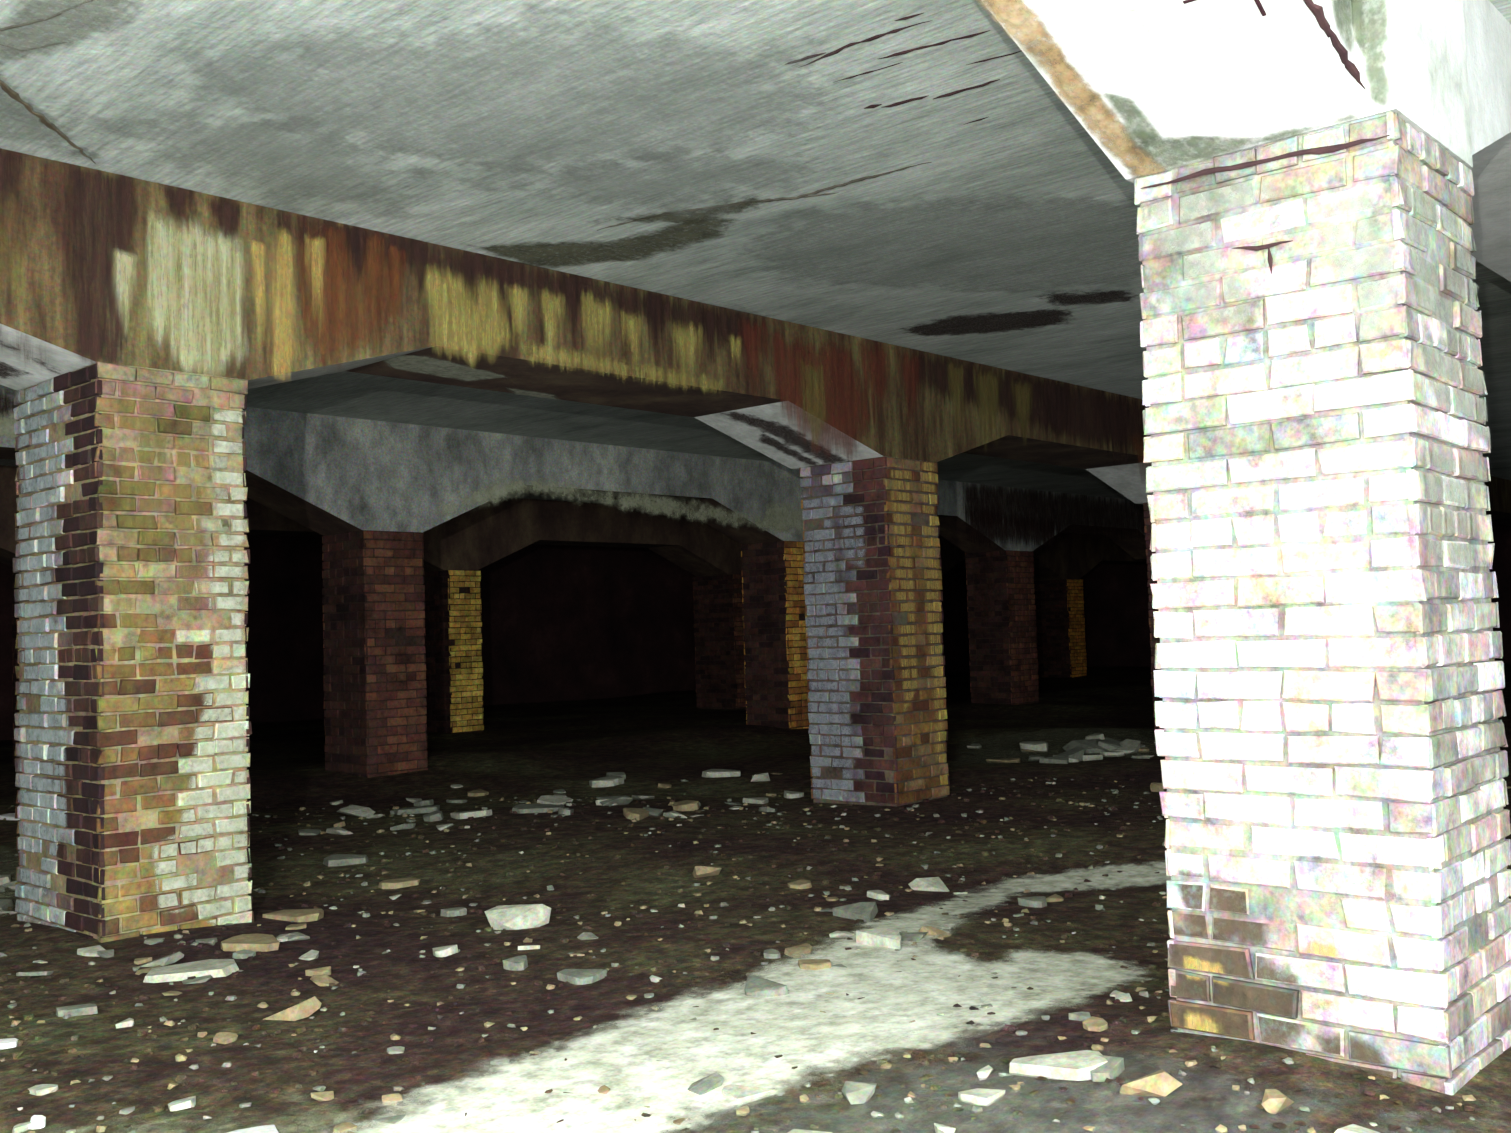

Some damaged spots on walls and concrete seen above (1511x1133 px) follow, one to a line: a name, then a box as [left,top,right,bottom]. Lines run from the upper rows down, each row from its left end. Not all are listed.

crack [0,0,96,164]
rust [983,0,1164,176]
crack [1303,0,1366,90]
damp [909,291,1138,337]